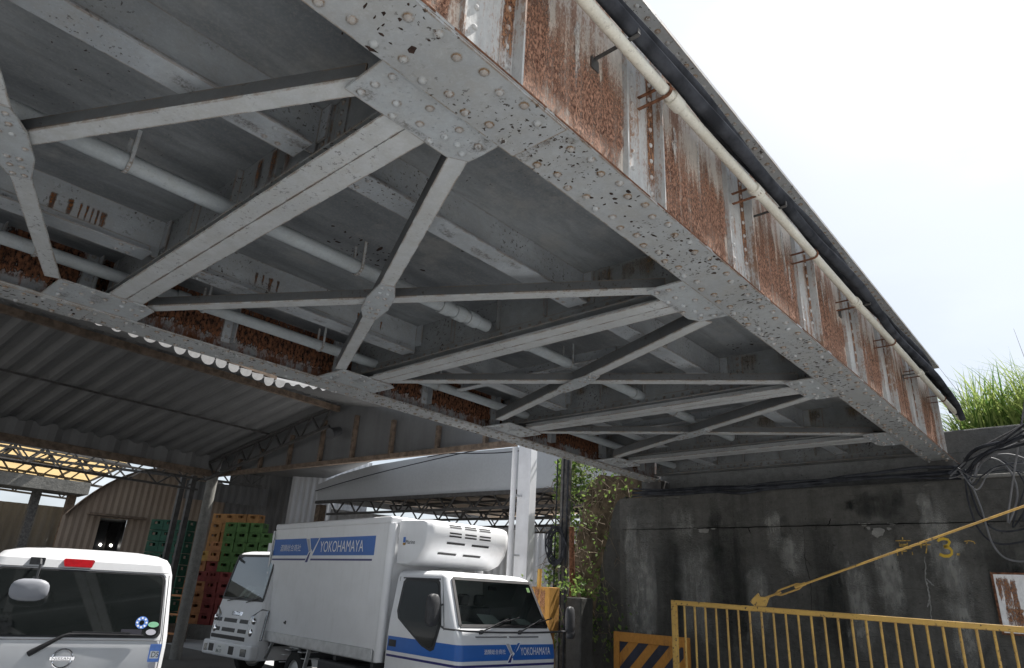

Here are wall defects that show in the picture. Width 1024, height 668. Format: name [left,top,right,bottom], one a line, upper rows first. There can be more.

corrosion [0,245,82,284]
corrosion [50,240,85,258]
corrosion [96,260,115,292]
corrosion [421,0,959,464]
corrosion [143,301,222,337]
corrosion [235,308,334,371]
corrosion [390,383,504,424]
water stain [766,515,803,572]
water stain [625,525,656,635]
water stain [838,571,871,643]
water stain [876,547,903,609]
water stain [920,498,976,661]